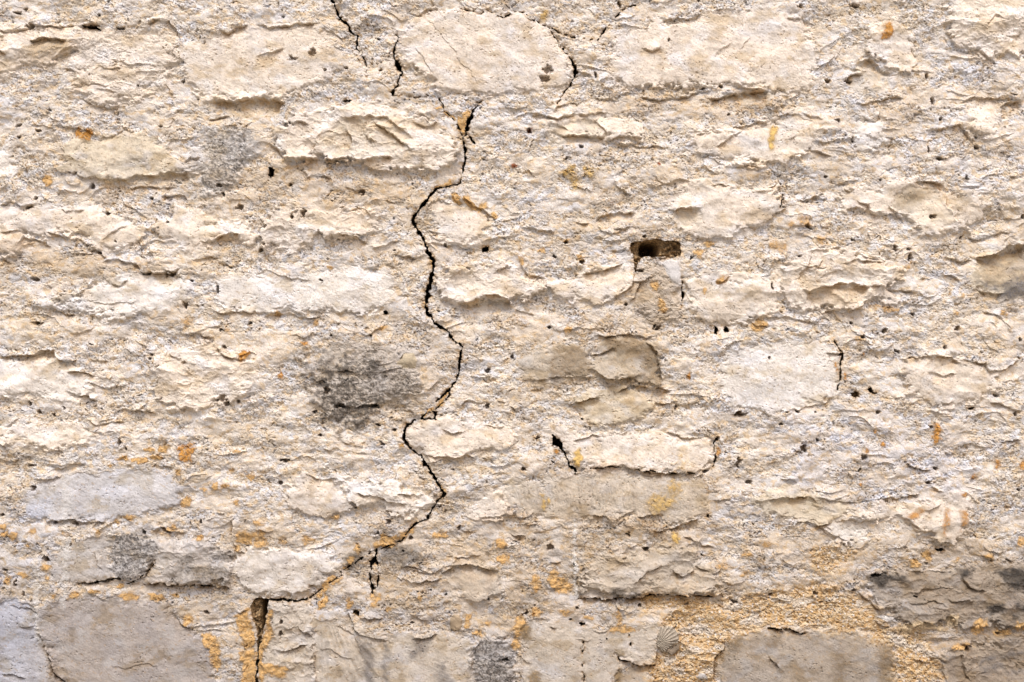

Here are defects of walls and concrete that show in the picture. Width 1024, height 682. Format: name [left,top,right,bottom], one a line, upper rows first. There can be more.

crack [330,0,367,73]
crack [462,4,636,104]
crack [269,35,482,603]
crack [552,434,718,475]
crack [254,641,262,682]